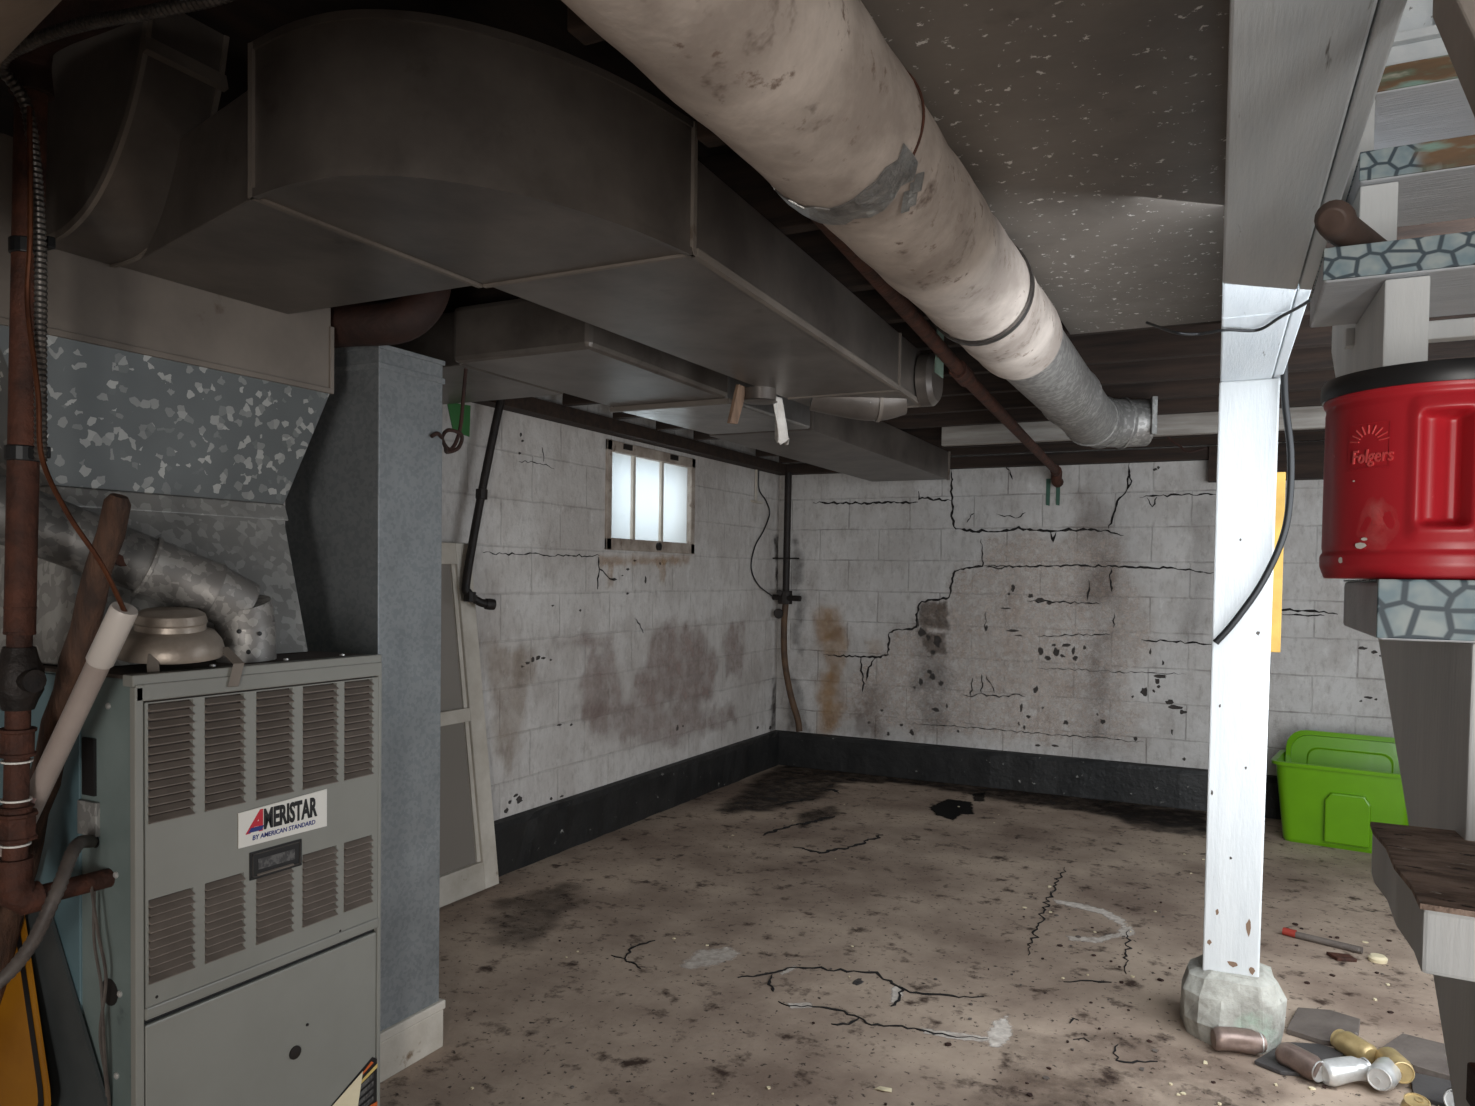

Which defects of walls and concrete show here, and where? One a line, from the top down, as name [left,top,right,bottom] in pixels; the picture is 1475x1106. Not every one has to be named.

crack [813,465,1216,742]
spalling [913,620,943,689]
spalling [1038,644,1086,661]
crack [764,789,883,854]
damp [719,766,1207,834]
crack [1027,867,1066,955]
crack [611,940,655,969]
crack [1063,930,1132,983]
crack [738,966,988,1039]